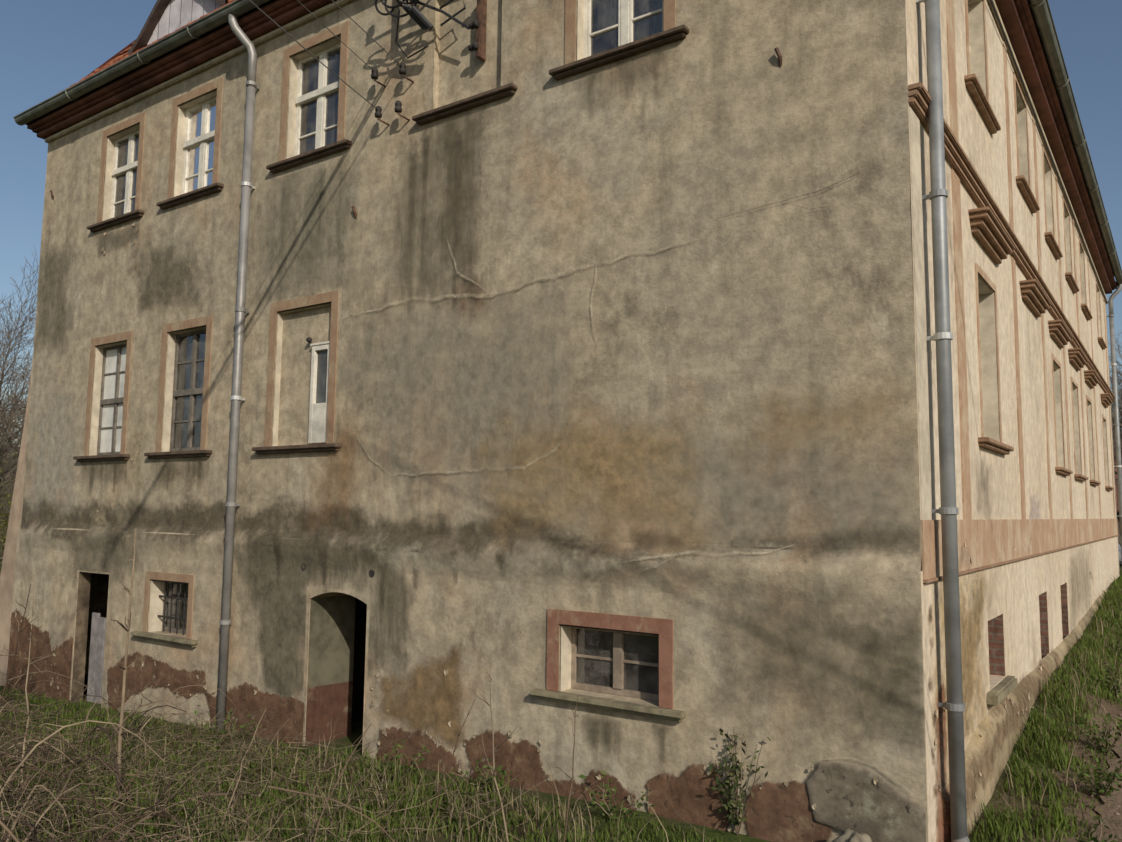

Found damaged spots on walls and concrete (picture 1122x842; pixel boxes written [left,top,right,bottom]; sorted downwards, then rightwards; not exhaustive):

water stain [300,171,346,272]
water stain [404,116,476,301]
water stain [37,256,66,344]
water stain [140,248,194,308]
crack [436,260,597,329]
water stain [21,428,673,703]
crack [638,551,694,571]
water stain [729,531,917,555]
peeling [6,610,73,702]
peeling [107,651,304,746]
flaking render [376,650,832,842]
water stain [960,579,984,728]